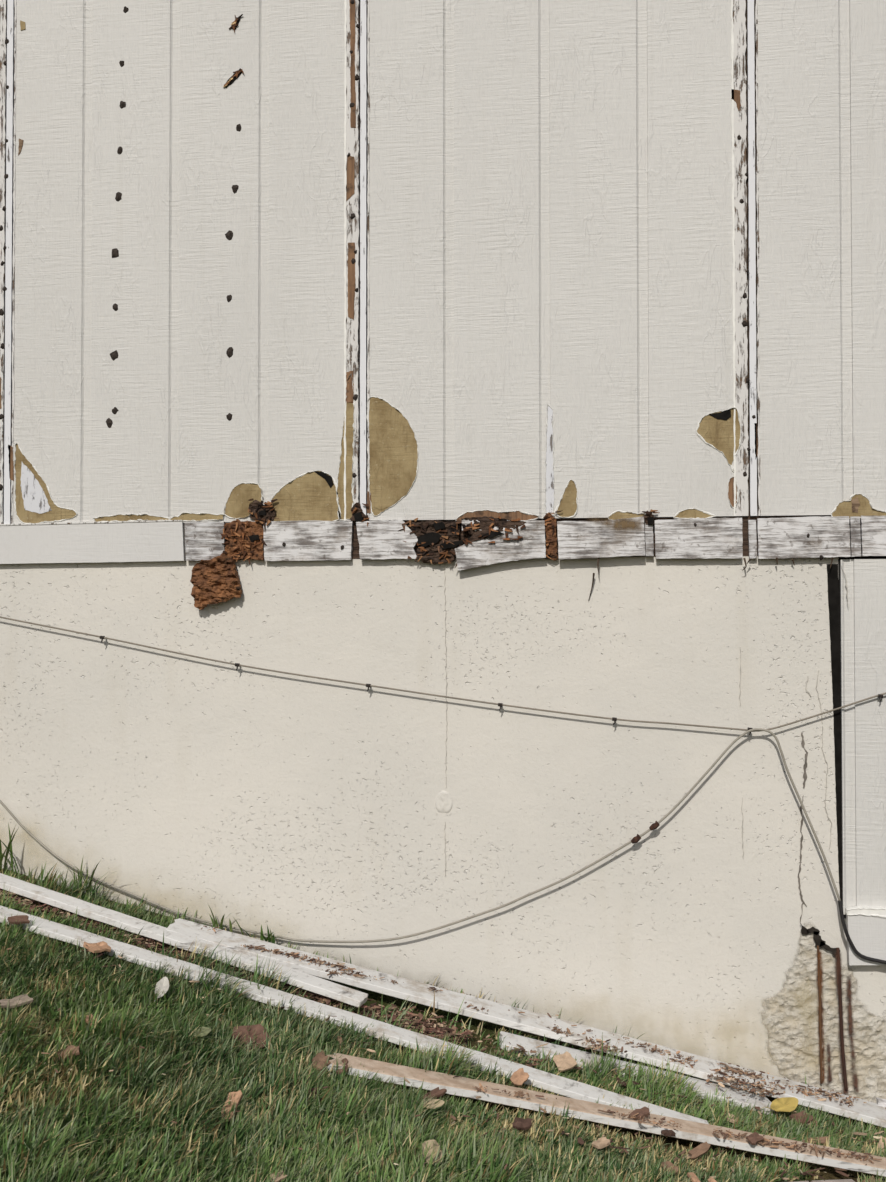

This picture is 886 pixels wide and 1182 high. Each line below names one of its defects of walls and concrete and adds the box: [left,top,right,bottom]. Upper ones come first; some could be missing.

peeling [731,89,741,111]
peeling [346,156,355,201]
peeling [347,242,356,320]
peeling [8,443,77,524]
peeling [93,371,419,522]
peeling [696,408,741,508]
peeling [831,494,886,519]
crack [798,564,849,957]
spalling [762,925,886,1103]
corrosion [817,951,859,1094]